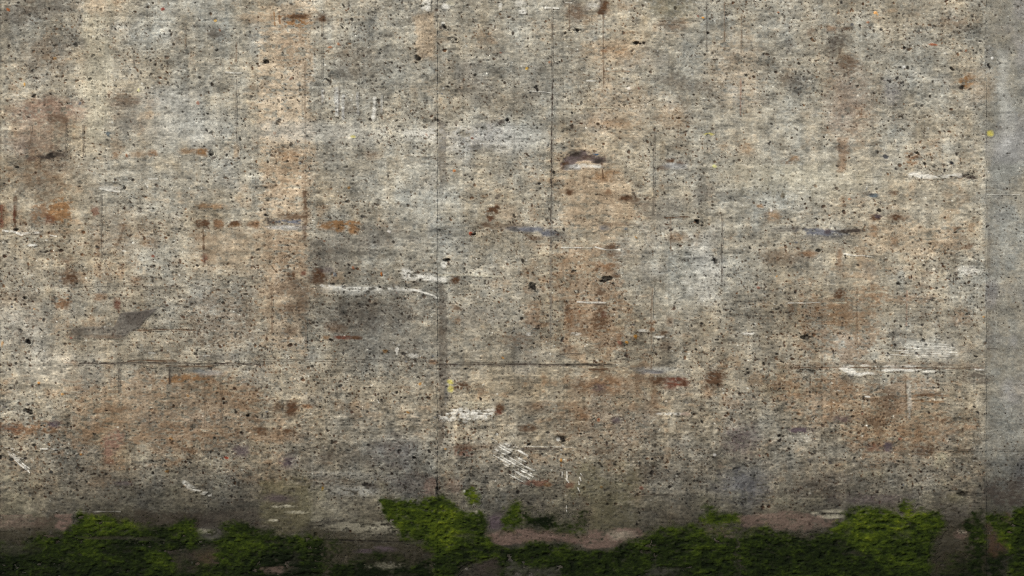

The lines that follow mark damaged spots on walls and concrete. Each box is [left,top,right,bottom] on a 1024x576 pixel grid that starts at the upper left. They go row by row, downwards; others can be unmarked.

corrosion [0,0,365,474]
corrosion [430,0,728,463]
damp [181,479,213,497]
damp [267,504,398,538]